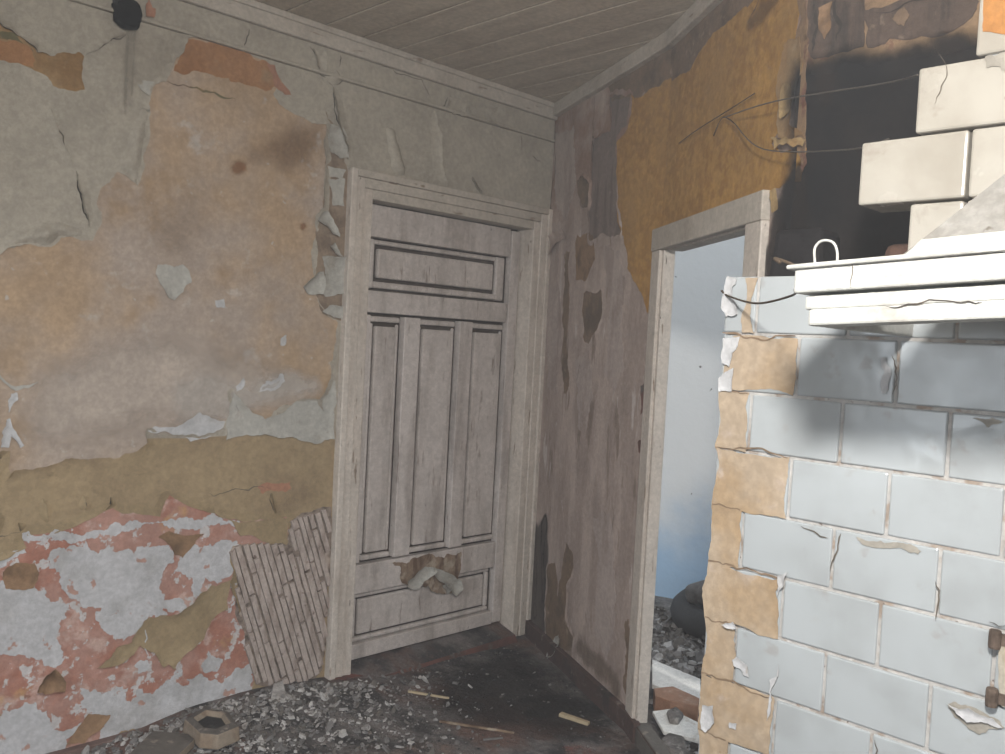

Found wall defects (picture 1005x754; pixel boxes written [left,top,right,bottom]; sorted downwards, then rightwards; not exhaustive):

peeling [0,4,93,102]
peeling [771,0,1005,150]
peeling [0,33,349,485]
peeling [546,89,633,394]
peeling [769,188,778,213]
spalling [0,491,332,754]
peeling [408,567,463,596]
peeling [544,537,576,659]
peeling [698,276,798,754]
crack [801,526,841,570]
crack [933,582,941,619]